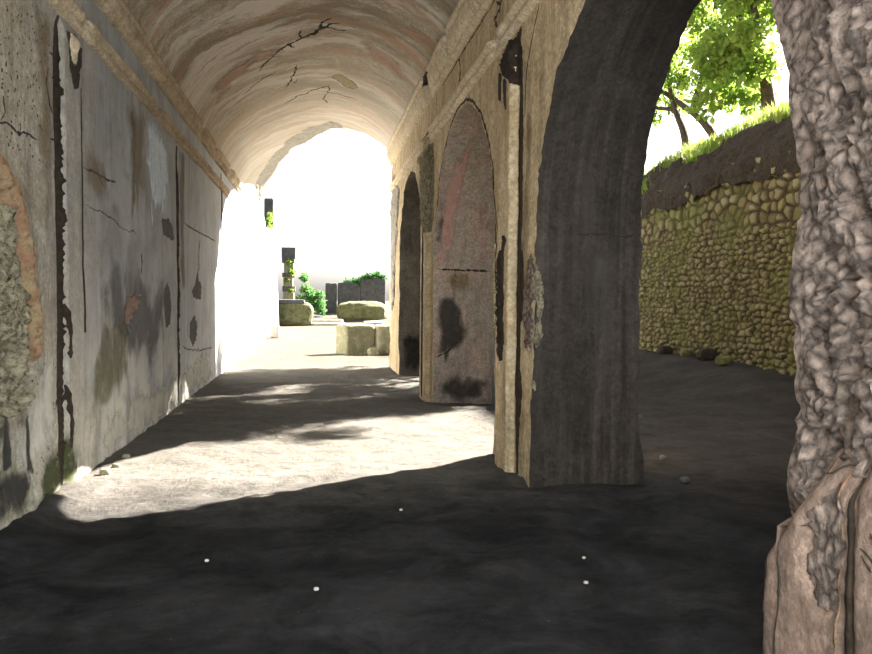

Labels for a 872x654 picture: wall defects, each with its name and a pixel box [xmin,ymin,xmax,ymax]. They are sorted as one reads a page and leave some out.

crack [0,96,55,141]
crack [45,51,53,114]
crack [243,18,354,103]
spalling [0,6,56,434]
damp [105,268,164,361]
damp [439,298,465,361]
spalling [520,250,544,353]
damp [442,378,485,399]